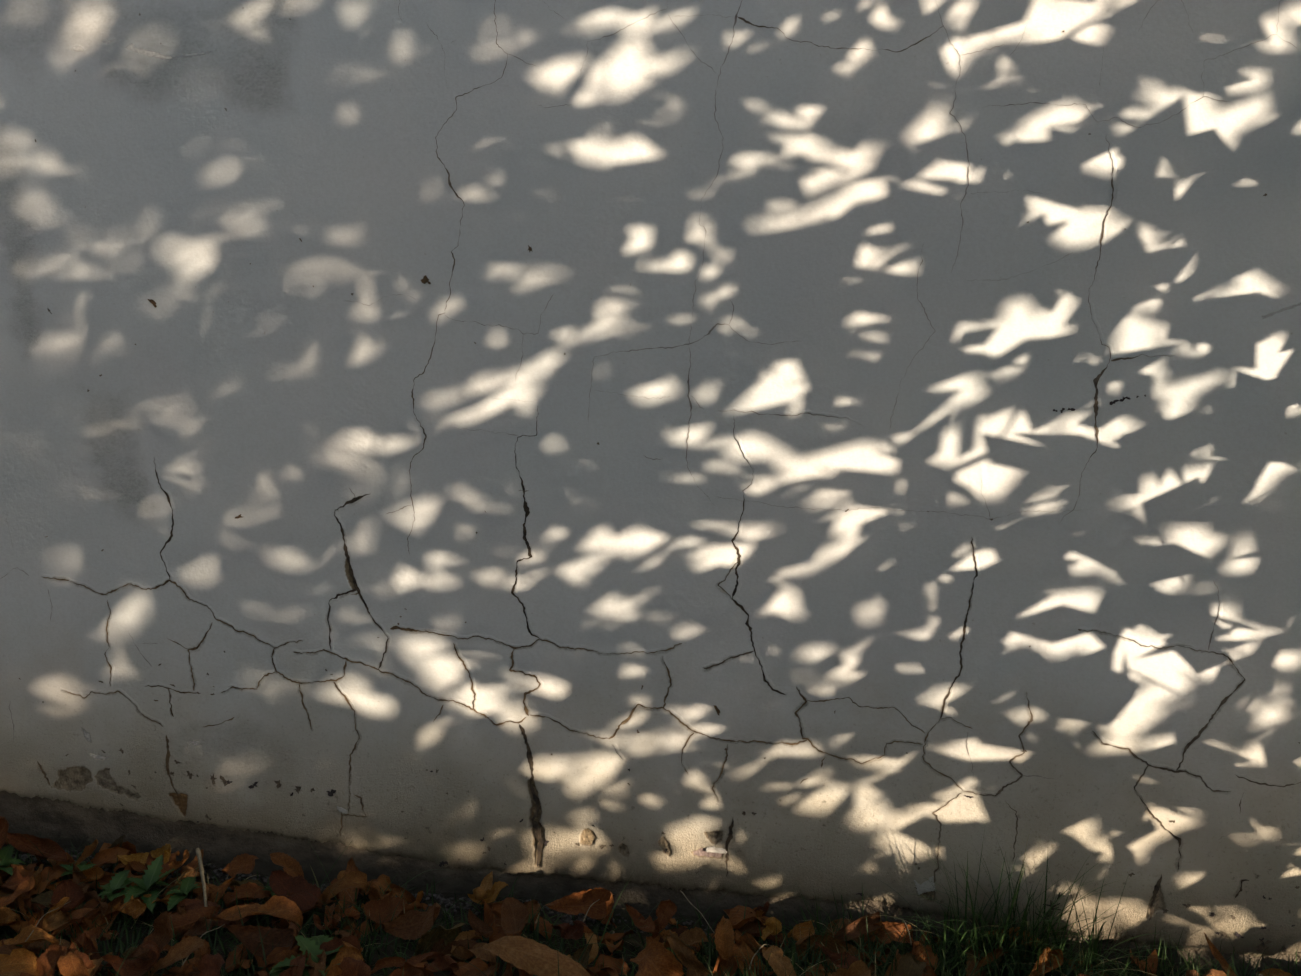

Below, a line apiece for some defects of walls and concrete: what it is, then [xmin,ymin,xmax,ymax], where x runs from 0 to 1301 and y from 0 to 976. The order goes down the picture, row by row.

crack [899,8,1295,526]
crack [4,0,1069,902]
spalling [55,748,141,806]
crack [1079,579,1301,921]
spalling [575,824,629,855]
spalling [659,831,671,854]
spalling [693,831,727,858]